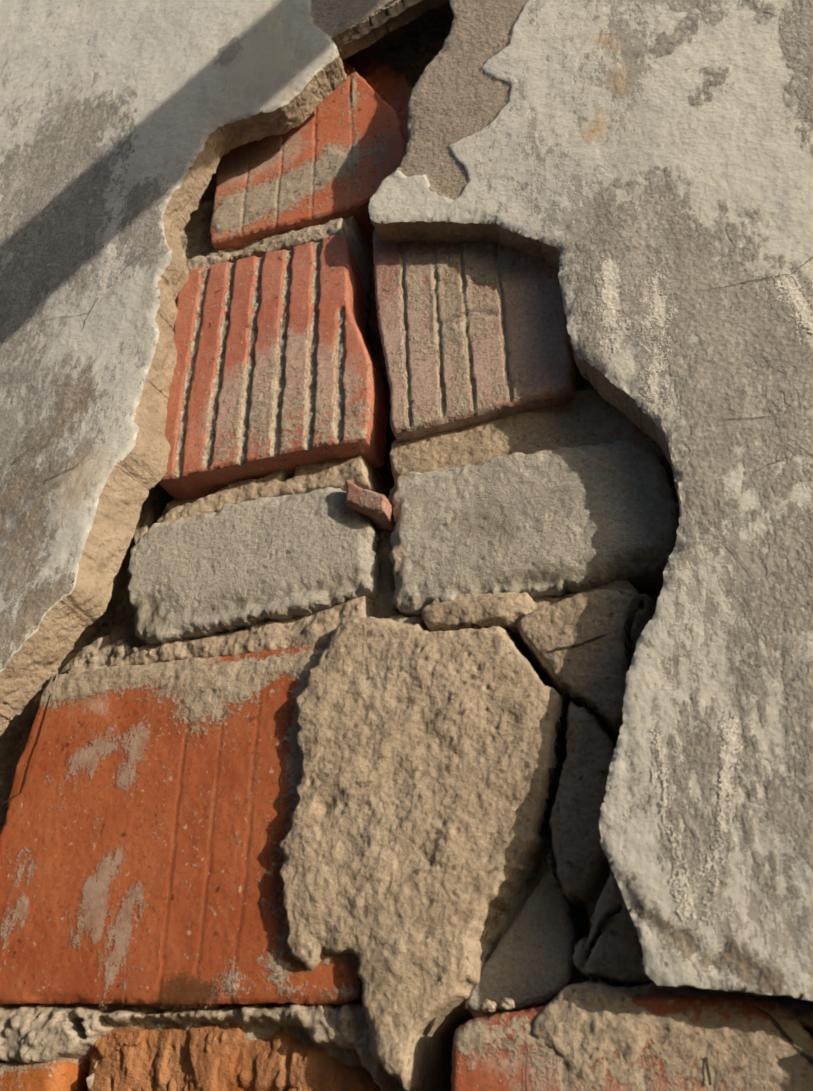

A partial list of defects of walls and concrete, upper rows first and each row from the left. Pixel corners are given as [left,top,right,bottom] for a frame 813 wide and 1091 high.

peeling [635,0,813,157]
crack [705,257,813,310]
flaking render [0,0,528,735]
peeling [369,166,813,932]
peeling [605,854,811,1001]
spalling [89,1023,381,1091]